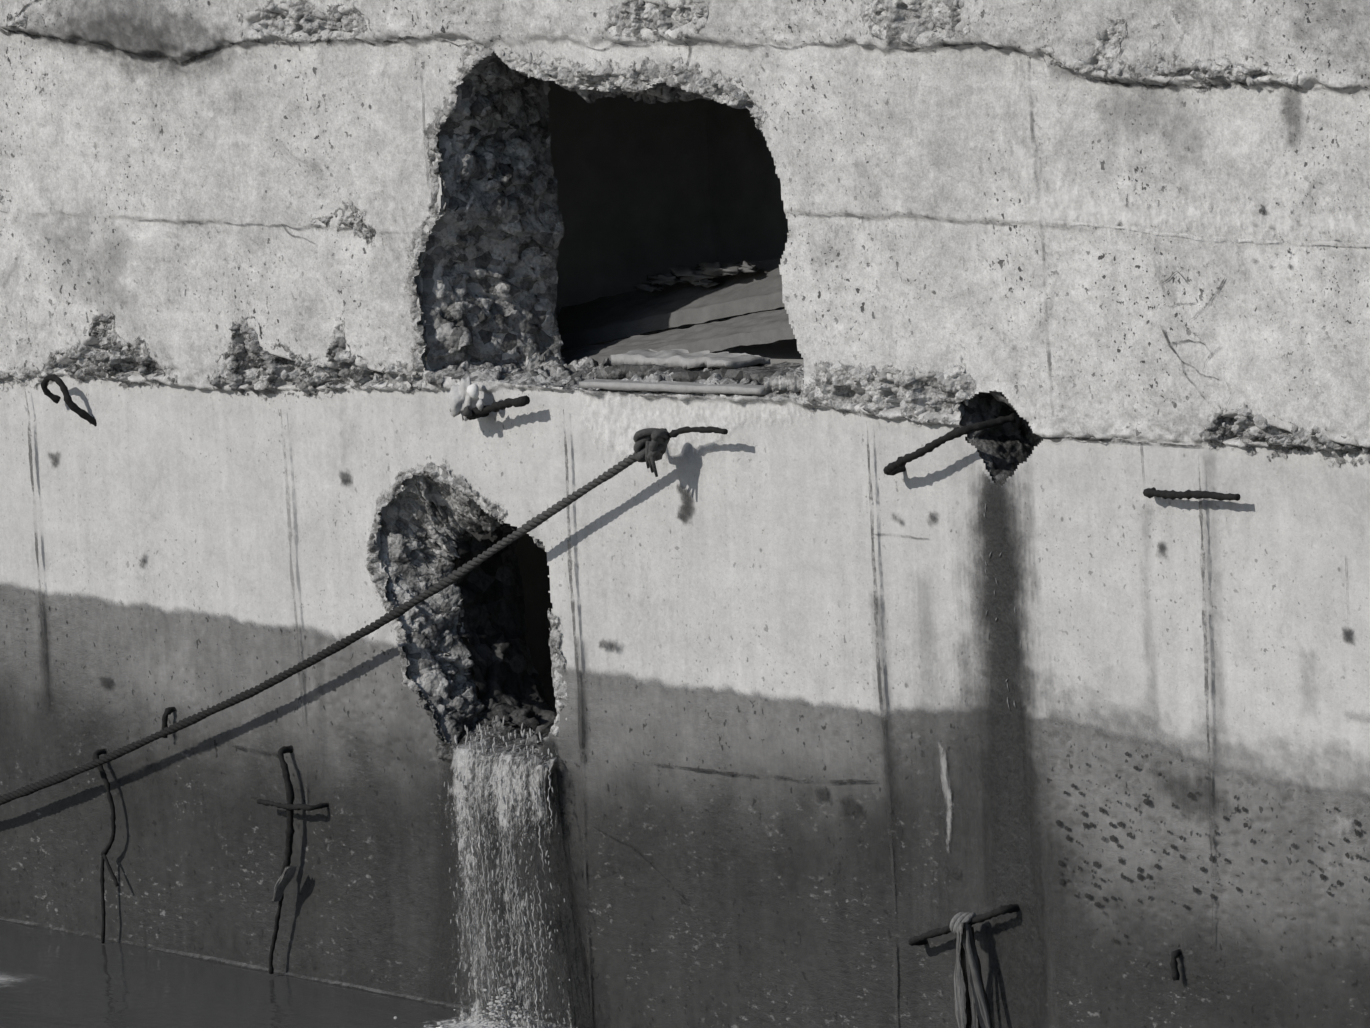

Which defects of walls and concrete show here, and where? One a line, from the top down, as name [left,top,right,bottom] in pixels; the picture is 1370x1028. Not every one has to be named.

crack [0,0,483,66]
spalling [0,311,177,391]
spalling [208,0,1043,486]
spalling [1199,404,1370,468]
spalling [365,458,569,772]
damp [0,473,1370,1028]